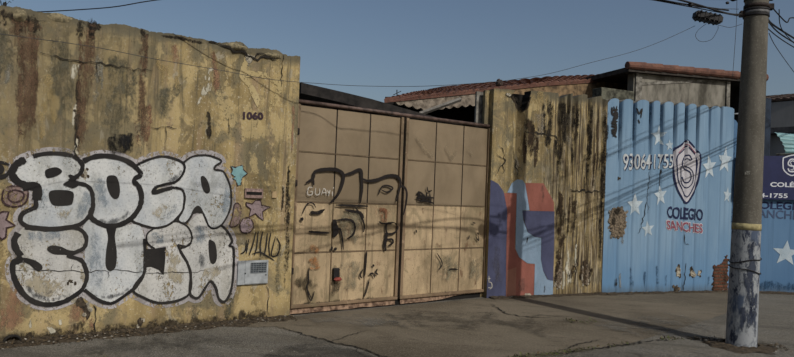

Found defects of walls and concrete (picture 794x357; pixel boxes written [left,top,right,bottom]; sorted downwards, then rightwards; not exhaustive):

leakage [0,9,40,83]
leakage [76,20,101,39]
crack [40,52,151,82]
leakage [95,56,137,153]
leakage [523,102,621,257]
spalling [608,206,628,239]
leakage [544,192,593,293]
spalling [672,264,702,291]
spalling [711,255,729,291]